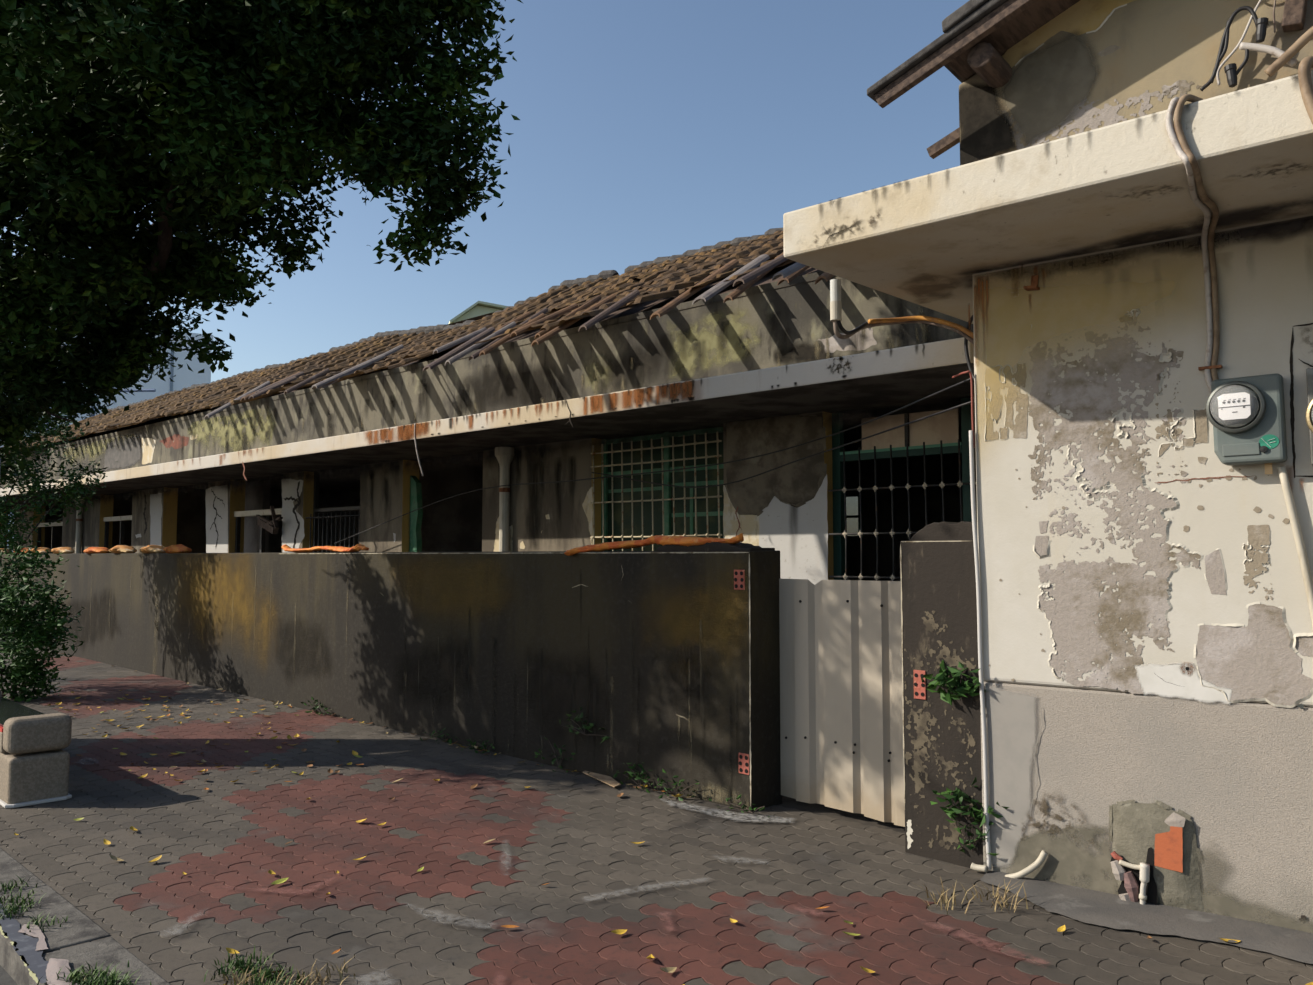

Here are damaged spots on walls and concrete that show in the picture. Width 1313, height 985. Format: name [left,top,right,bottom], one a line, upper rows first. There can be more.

leakage [815,214,880,243]
leakage [104,437,141,472]
corrosion [366,408,519,444]
leakage [385,332,701,442]
corrosion [584,380,693,415]
leakage [770,314,865,388]
crack [210,489,225,547]
crack [283,481,301,548]
peeling [984,308,1269,694]
peeling [1193,506,1313,709]
flaking render [900,541,991,850]
spalling [1109,800,1206,912]